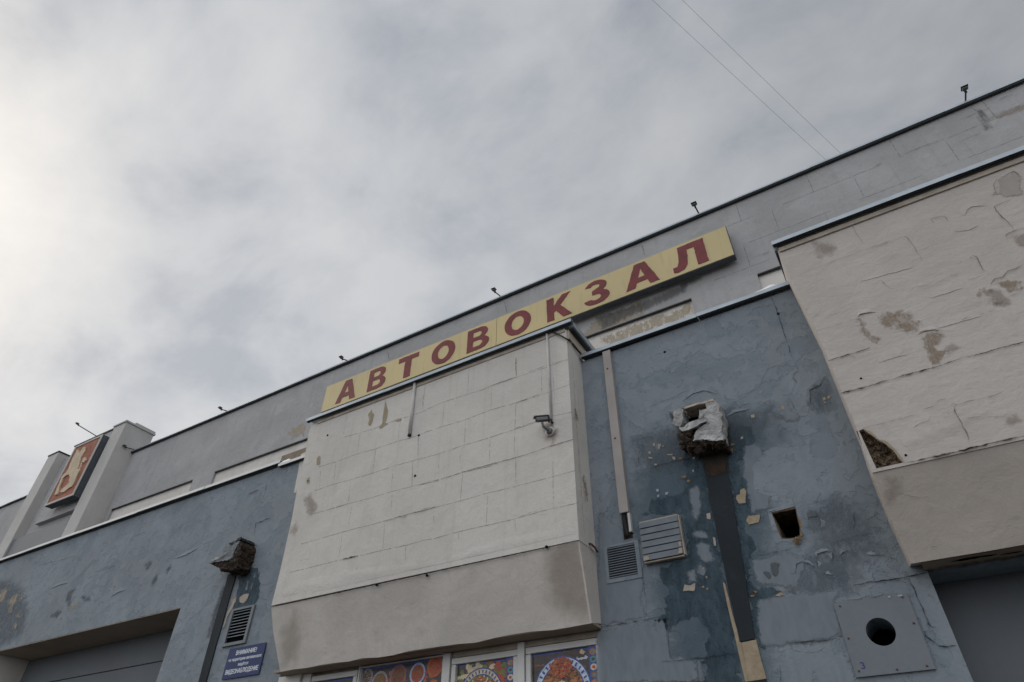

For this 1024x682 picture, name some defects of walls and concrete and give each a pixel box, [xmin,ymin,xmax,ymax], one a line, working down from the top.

peeling [584,287,691,343]
peeling [857,309,945,364]
peeling [977,280,1023,306]
crack [843,342,1023,393]
spalling [857,428,904,469]
peeling [597,451,742,682]